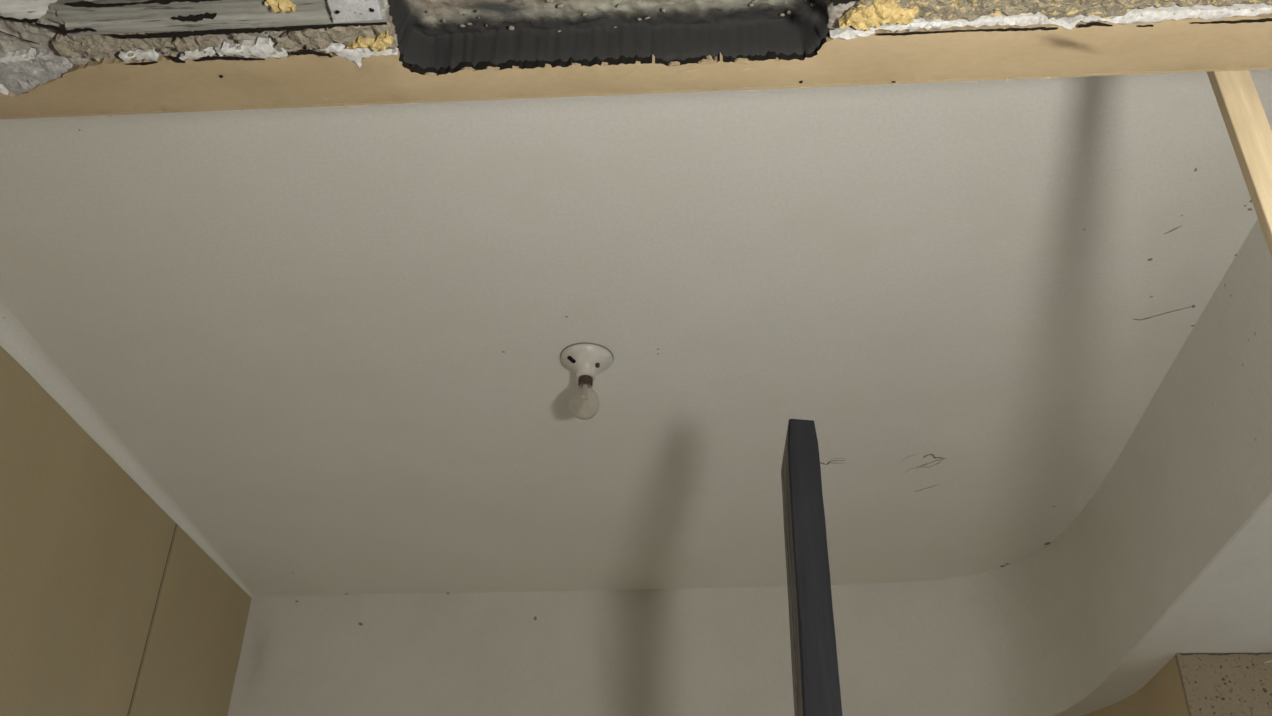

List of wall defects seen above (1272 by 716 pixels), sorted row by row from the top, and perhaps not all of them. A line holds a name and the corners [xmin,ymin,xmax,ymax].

spalling [0,0,399,68]
spalling [405,0,791,32]
spalling [810,0,1272,40]
crack [901,454,946,492]
crack [782,473,798,711]